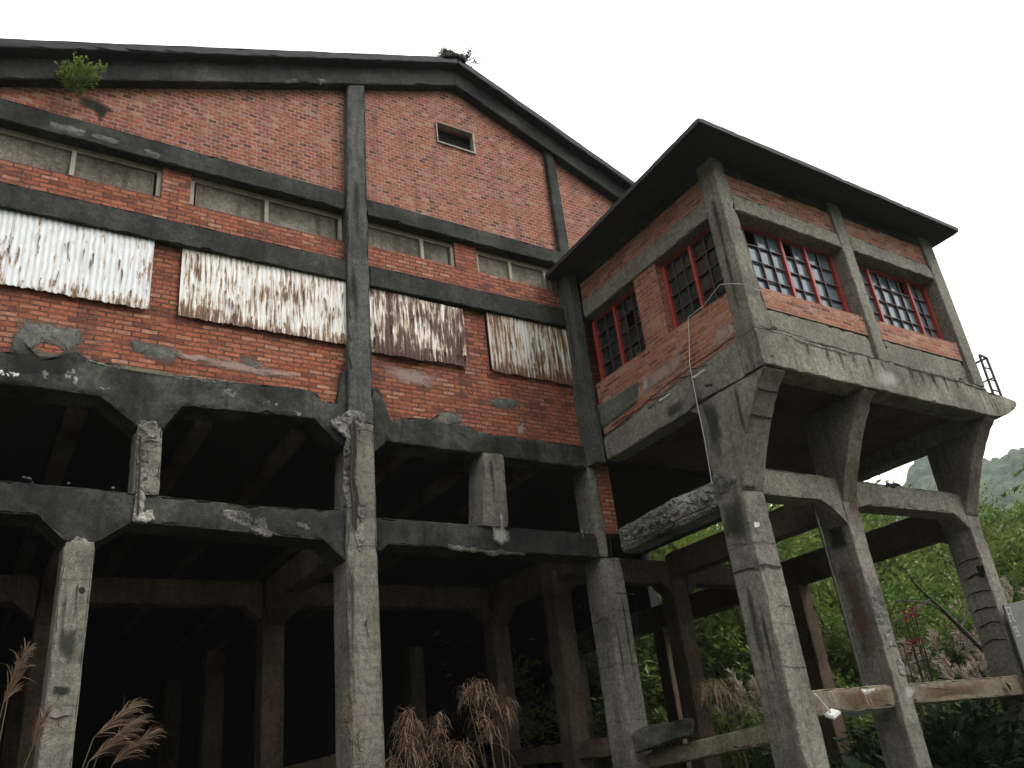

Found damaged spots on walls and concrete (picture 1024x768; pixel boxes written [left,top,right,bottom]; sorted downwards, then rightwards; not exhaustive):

rust [206,280,255,318]
rust [390,302,432,337]
rust [494,337,570,379]
spalling [132,420,159,524]
spalling [330,410,366,552]
spalling [223,509,277,538]
crack [957,557,1007,645]